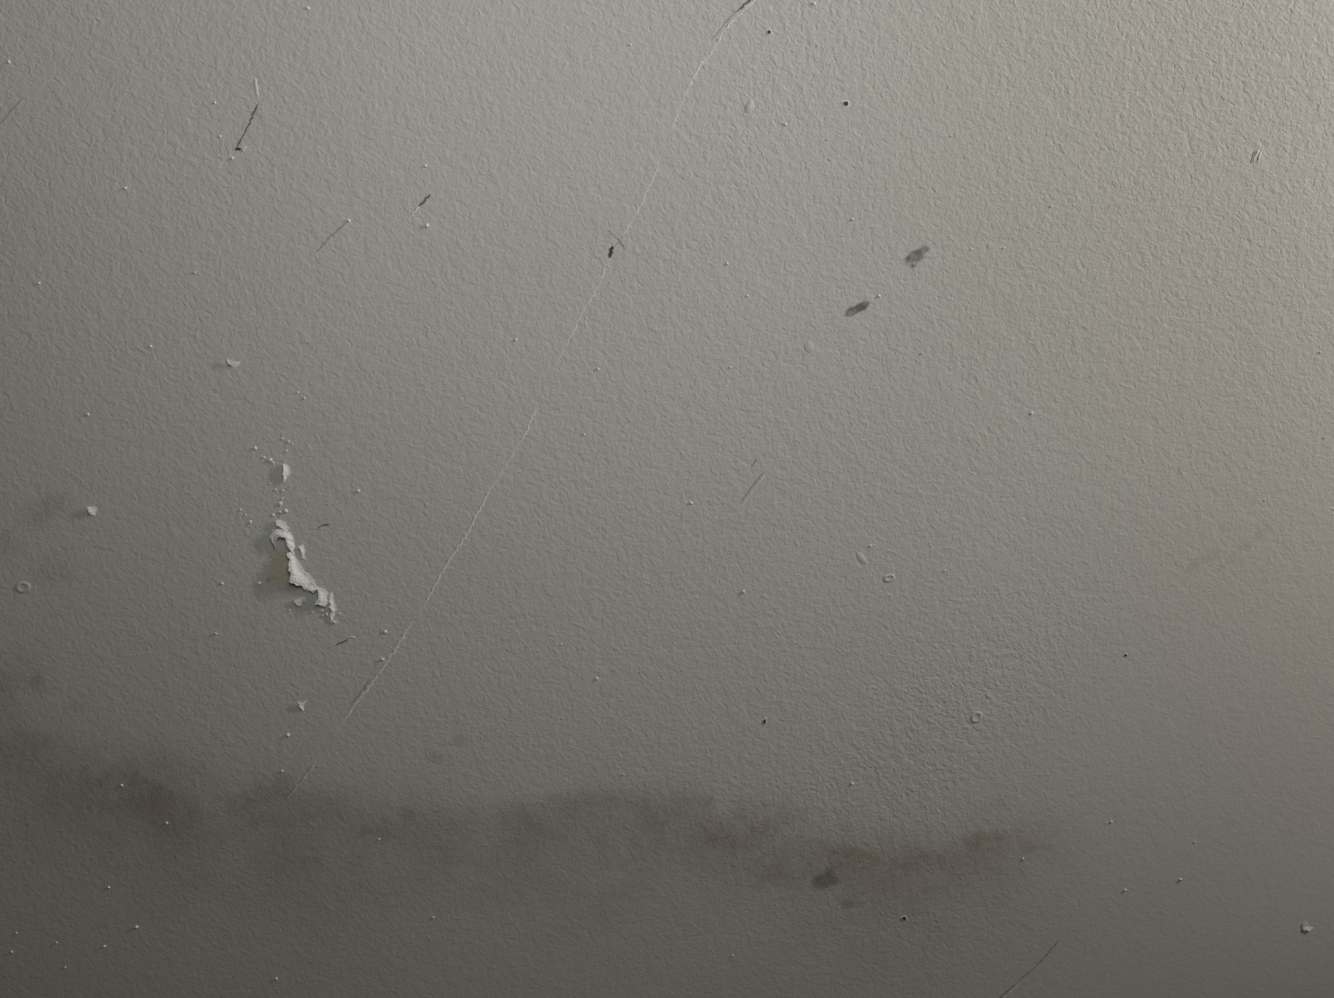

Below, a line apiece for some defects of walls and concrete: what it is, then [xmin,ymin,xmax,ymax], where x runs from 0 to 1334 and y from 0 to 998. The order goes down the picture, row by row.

peeling [253,438,340,624]